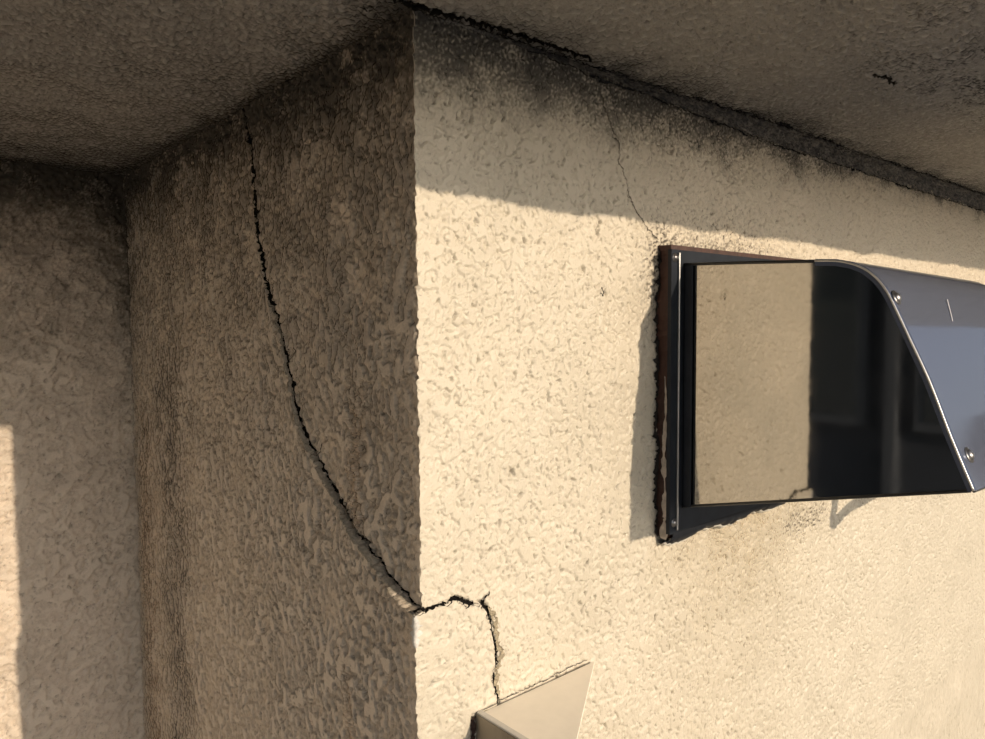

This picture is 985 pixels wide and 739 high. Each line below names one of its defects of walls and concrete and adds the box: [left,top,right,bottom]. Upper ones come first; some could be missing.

leakage [0,2,867,310]
crack [364,0,592,62]
crack [599,91,659,240]
crack [242,108,505,706]